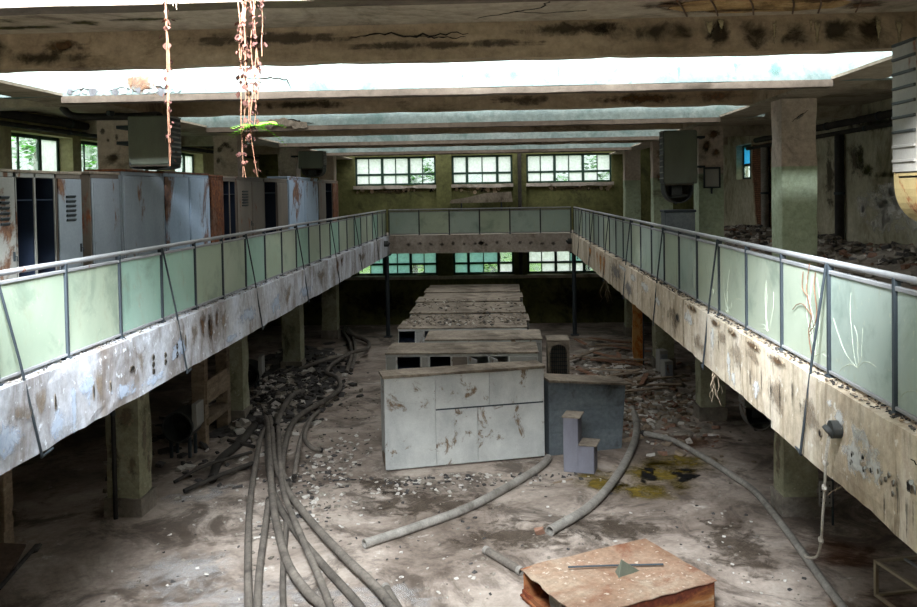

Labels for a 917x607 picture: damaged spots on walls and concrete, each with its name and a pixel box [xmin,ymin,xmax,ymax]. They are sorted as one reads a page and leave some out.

crack [353,2,586,39]
damp [200,32,335,46]
damp [349,37,529,50]
damp [541,22,614,43]
damp [744,18,881,49]
damp [18,40,83,64]
peeling [67,85,181,97]
damp [257,99,339,109]
damp [500,96,547,105]
damp [597,93,683,105]
spalling [267,117,311,129]
peeling [828,401,895,497]